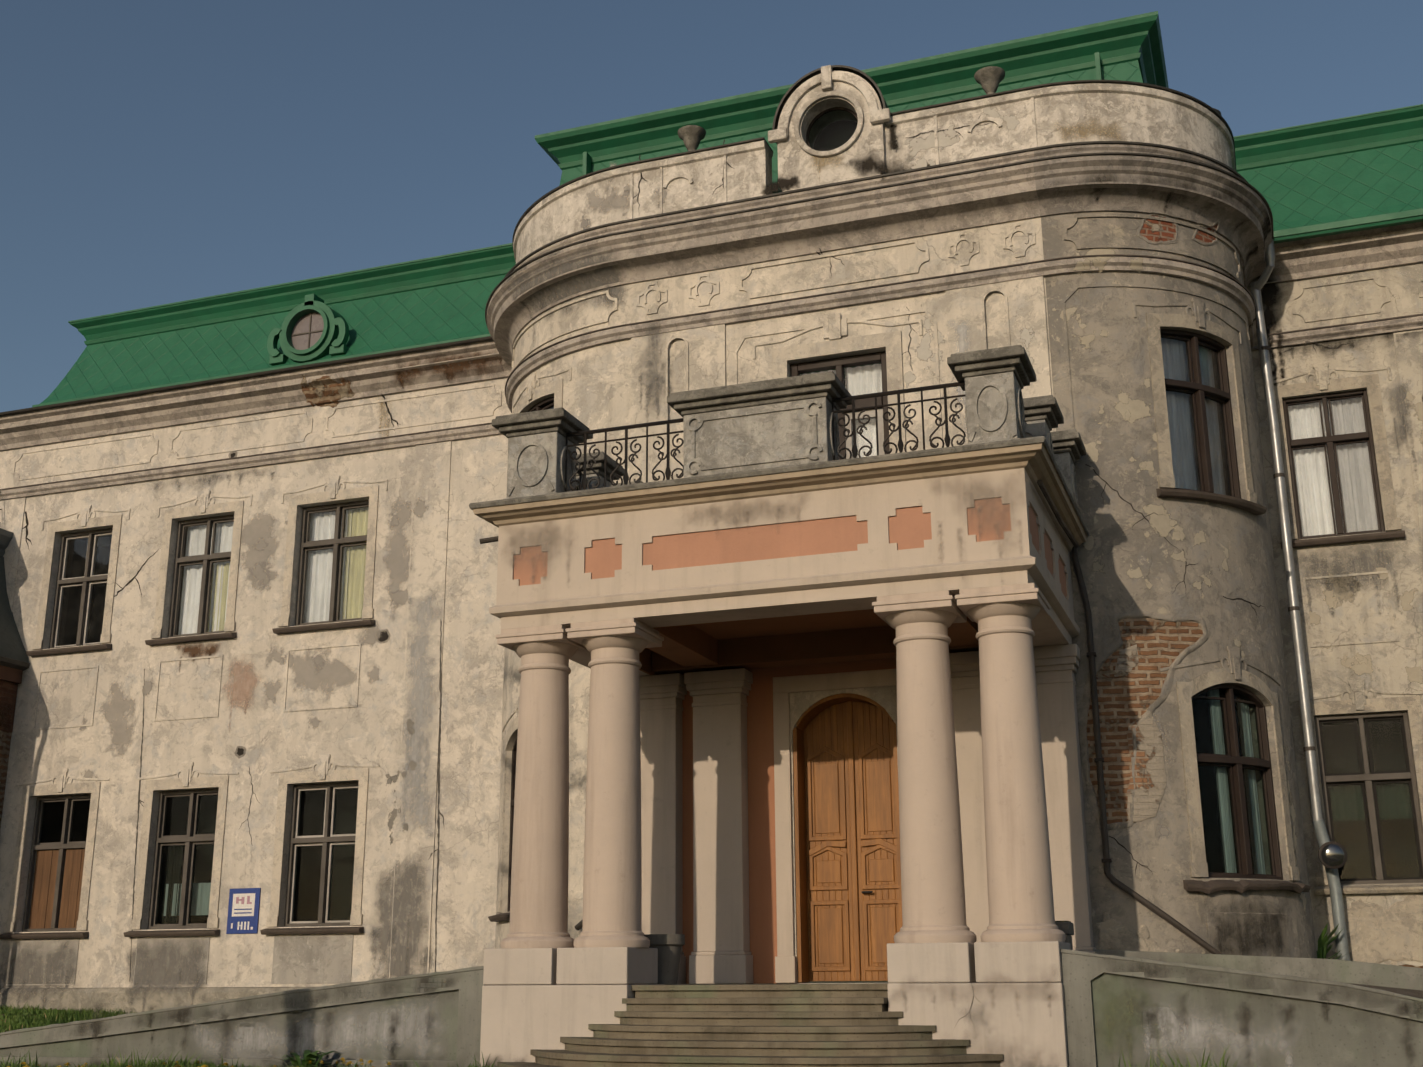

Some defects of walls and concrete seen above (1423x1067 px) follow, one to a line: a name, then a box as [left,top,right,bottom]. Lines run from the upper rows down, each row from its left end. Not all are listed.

flaking render [1073,211,1220,288]
spalling [300,375,355,408]
crack [1085,464,1198,594]
crack [114,548,160,597]
crack [1223,596,1264,615]
flaking render [1078,609,1209,830]
spalling [1326,895,1423,968]